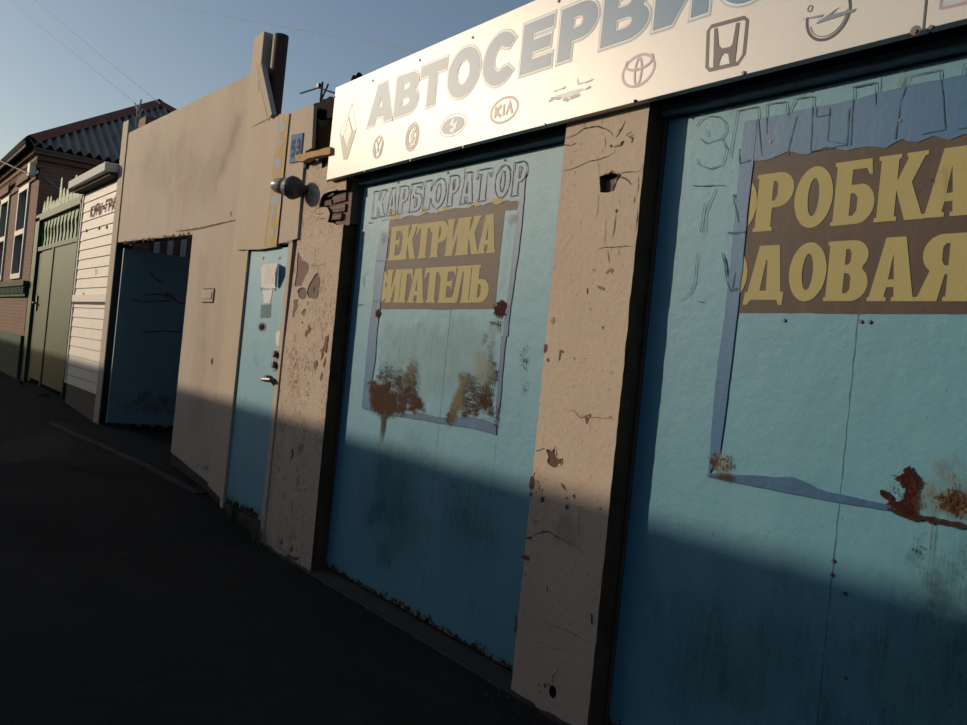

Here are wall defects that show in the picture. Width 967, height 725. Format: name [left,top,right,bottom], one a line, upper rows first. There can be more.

spalling [319,187,353,225]
spalling [599,170,620,193]
peeling [292,252,319,337]
rust [367,360,424,442]
rust [445,299,509,428]
peeling [536,446,563,468]
rust [707,453,733,481]
rust [880,466,967,549]